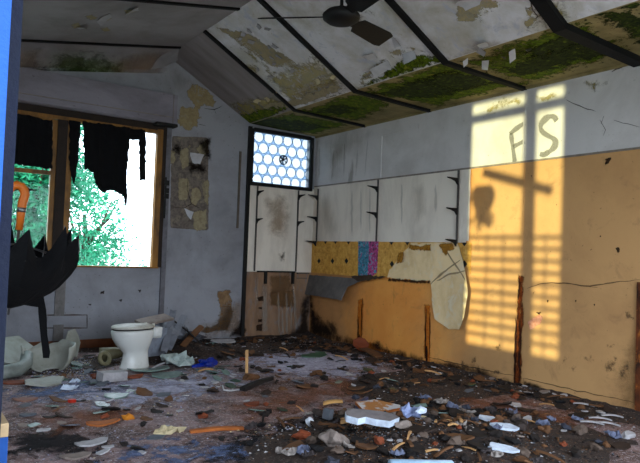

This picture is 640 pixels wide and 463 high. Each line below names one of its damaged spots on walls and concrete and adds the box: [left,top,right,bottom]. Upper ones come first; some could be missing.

peeling [219,23,301,73]
peeling [170,84,216,231]
peeling [201,290,233,333]
water stain [271,276,293,307]
peeling [387,243,468,329]
corrosion [513,275,524,383]
crack [529,280,633,288]